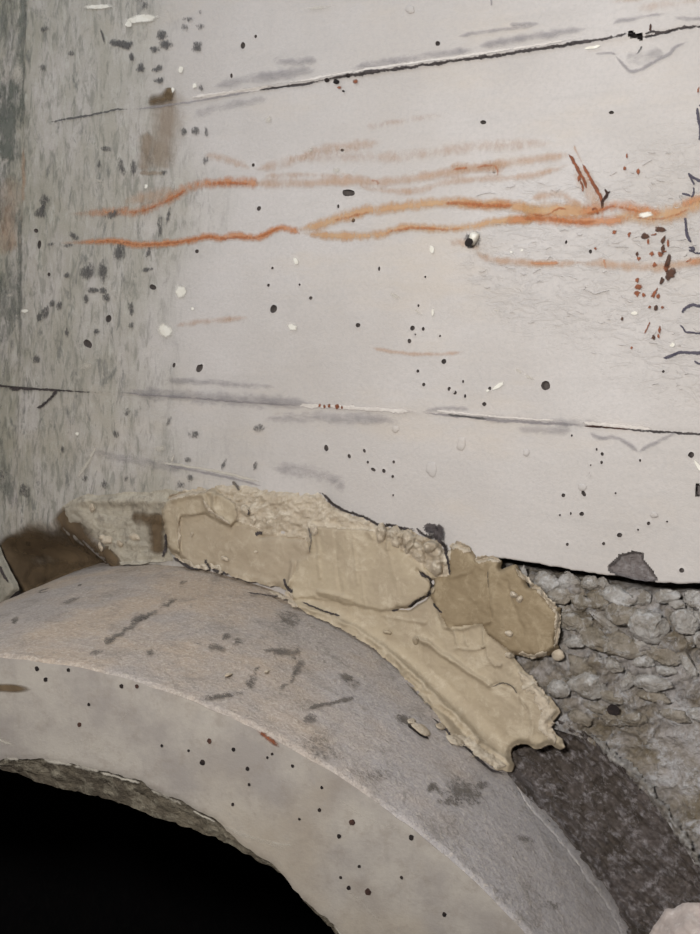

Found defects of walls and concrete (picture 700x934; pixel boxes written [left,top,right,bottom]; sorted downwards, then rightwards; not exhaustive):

crack [52,24,700,122]
damp [149,88,173,105]
rust [103,178,256,214]
rust [85,197,700,311]
crack [0,384,88,408]
crack [133,393,237,402]
crack [267,403,409,414]
crack [435,410,700,435]
spalling [500,551,700,864]